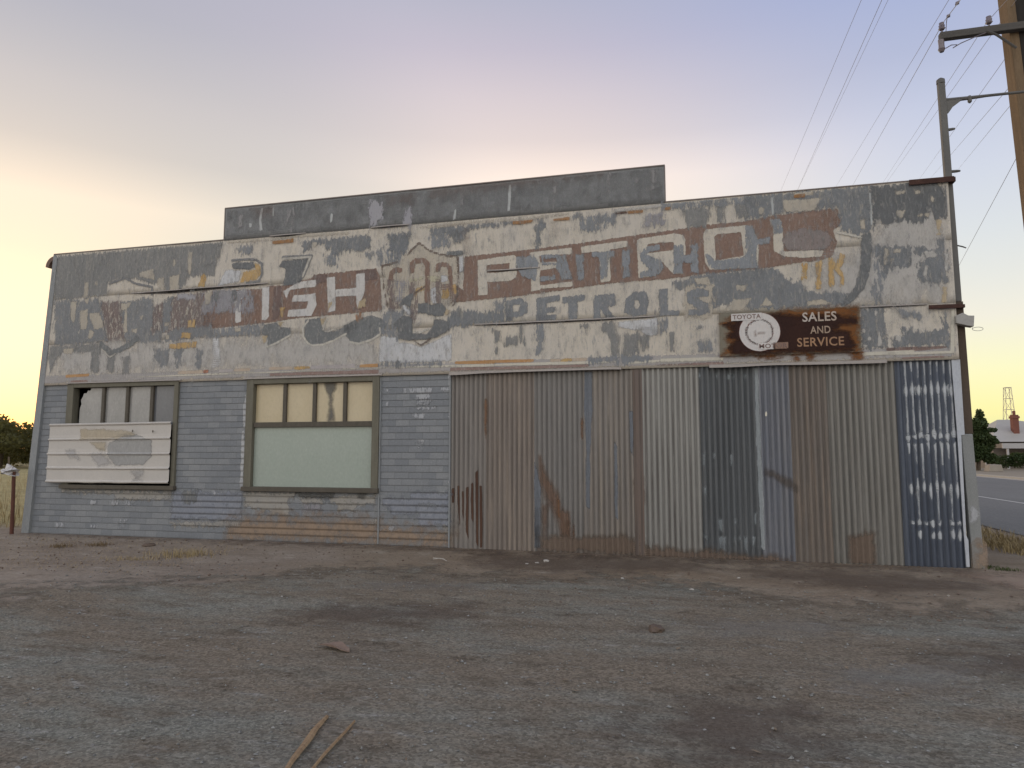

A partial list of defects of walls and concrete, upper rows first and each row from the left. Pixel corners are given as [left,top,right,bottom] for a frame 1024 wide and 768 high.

peeling [301,183,948,268]
peeling [49,241,264,374]
peeling [447,297,545,356]
peeling [588,317,675,366]
peeling [672,268,849,311]
peeling [860,238,951,352]
peeling [378,360,449,420]
peeling [61,395,452,533]
rust [452,470,483,547]
rust [539,458,574,537]